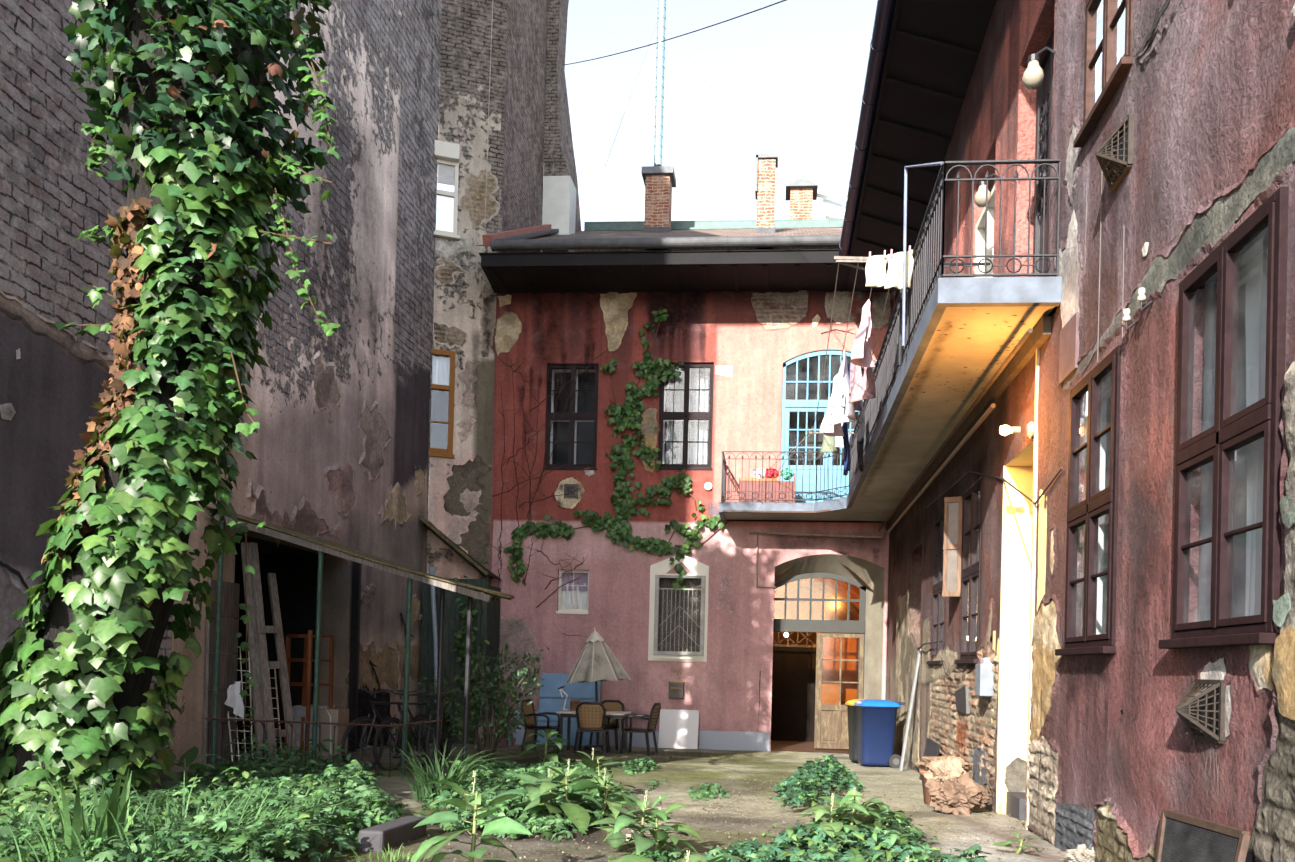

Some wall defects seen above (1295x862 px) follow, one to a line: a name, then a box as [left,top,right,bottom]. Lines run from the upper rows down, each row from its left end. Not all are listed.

flaking render [434,169,500,286]
peeling [1142,122,1295,268]
peeling [311,351,342,424]
peeling [433,322,481,441]
peeling [493,293,524,357]
peeling [598,292,639,353]
peeling [749,290,893,331]
peeling [246,399,492,565]
flaking render [1198,361,1295,862]
flaking render [895,524,1168,862]